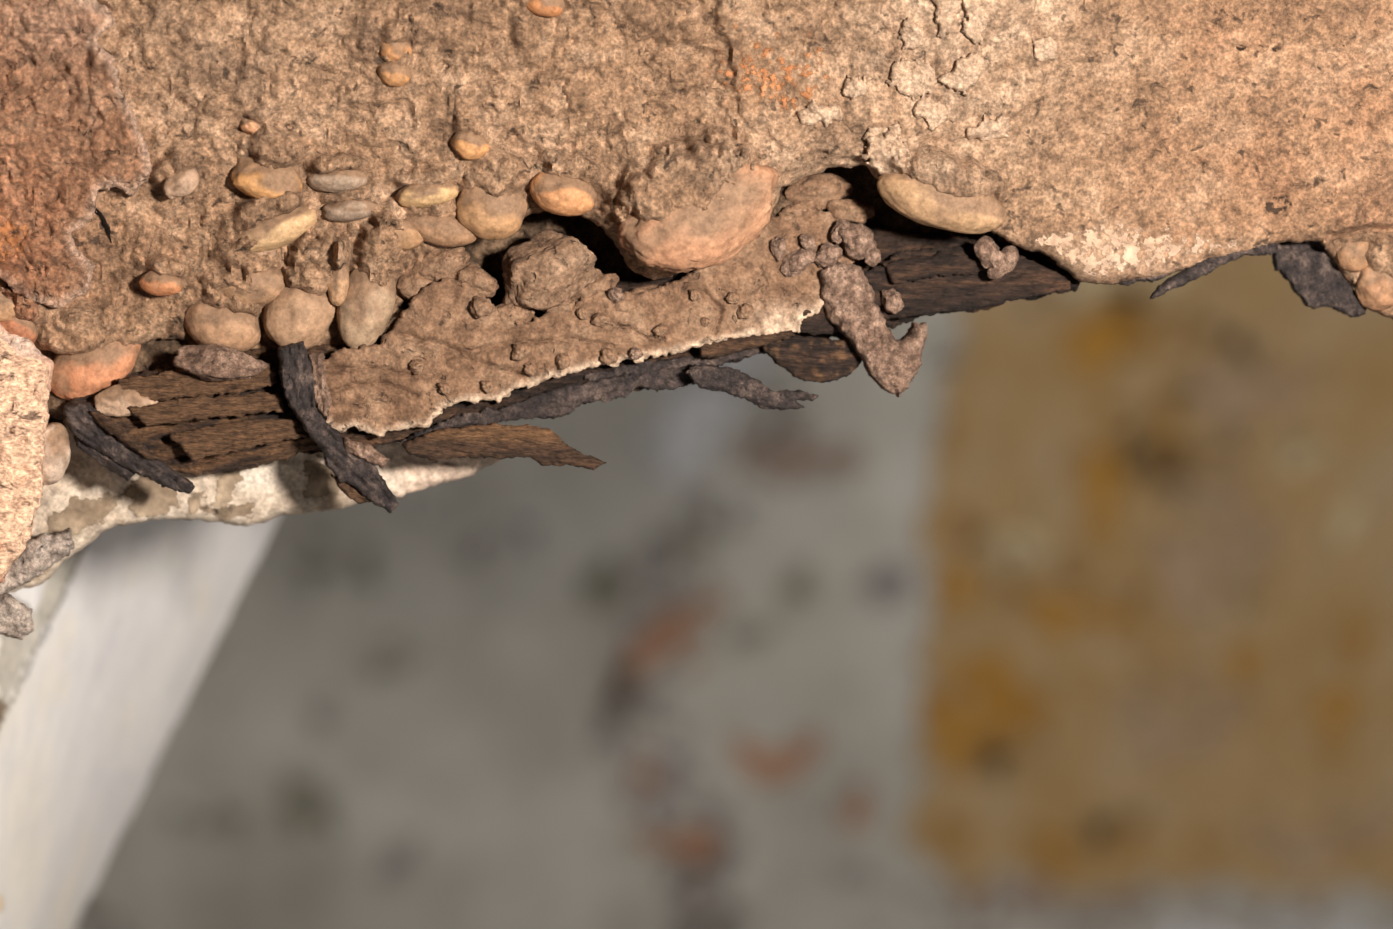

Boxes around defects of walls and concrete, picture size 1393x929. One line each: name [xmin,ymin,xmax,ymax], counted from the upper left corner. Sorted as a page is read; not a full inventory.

crack [95,208,112,243]
spalling [773,123,1062,269]
spalling [1265,196,1292,214]
spalling [379,211,660,339]
spalling [131,339,268,382]
spalling [47,391,68,420]